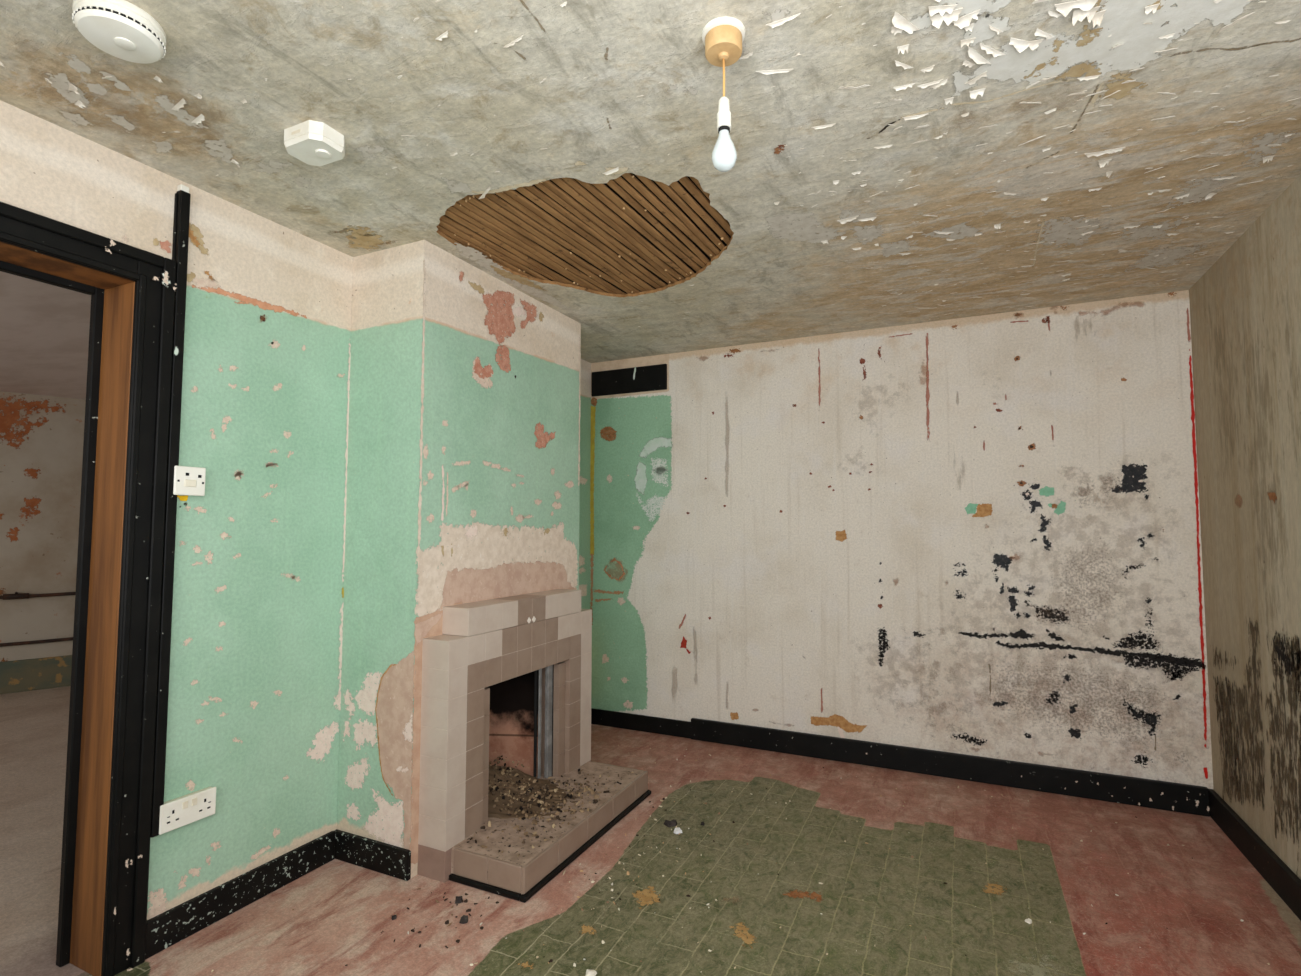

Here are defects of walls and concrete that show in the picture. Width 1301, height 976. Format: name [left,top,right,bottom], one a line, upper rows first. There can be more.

peeling [45,52,136,133]
peeling [874,0,1266,174]
peeling [765,157,1004,330]
peeling [980,118,1301,323]
peeling [0,395,66,449]
flaking render [306,243,588,864]
peeling [835,530,847,542]
peeling [965,503,993,517]
peeling [811,688,867,738]
water stain [947,733,987,746]
water stain [1046,674,1081,739]
water stain [1114,597,1301,873]